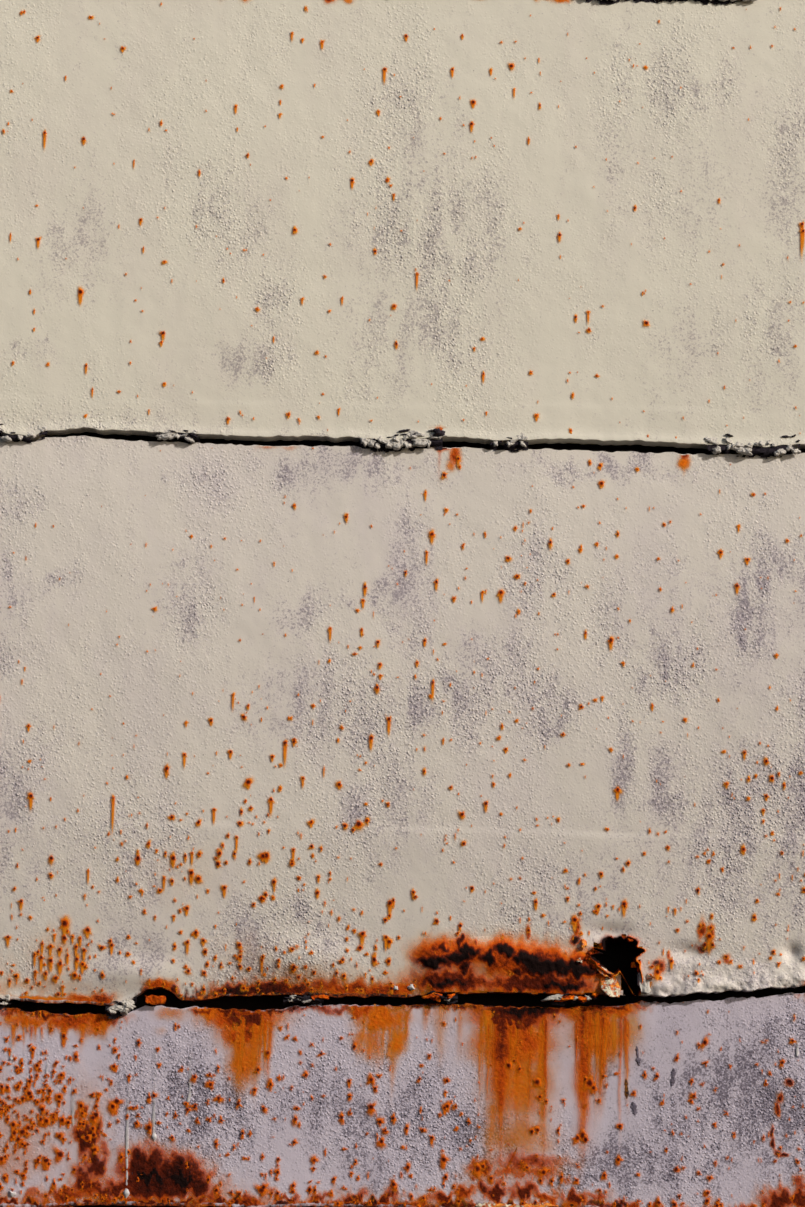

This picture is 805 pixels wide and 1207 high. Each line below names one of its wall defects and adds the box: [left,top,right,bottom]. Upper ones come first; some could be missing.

peeling [0,424,48,444]
peeling [156,429,200,444]
peeling [359,429,447,453]
peeling [490,433,528,452]
peeling [704,434,801,459]
corrosion [328,582,489,715]
corrosion [0,750,805,1207]
peeling [540,939,621,1006]
peeling [636,960,656,994]